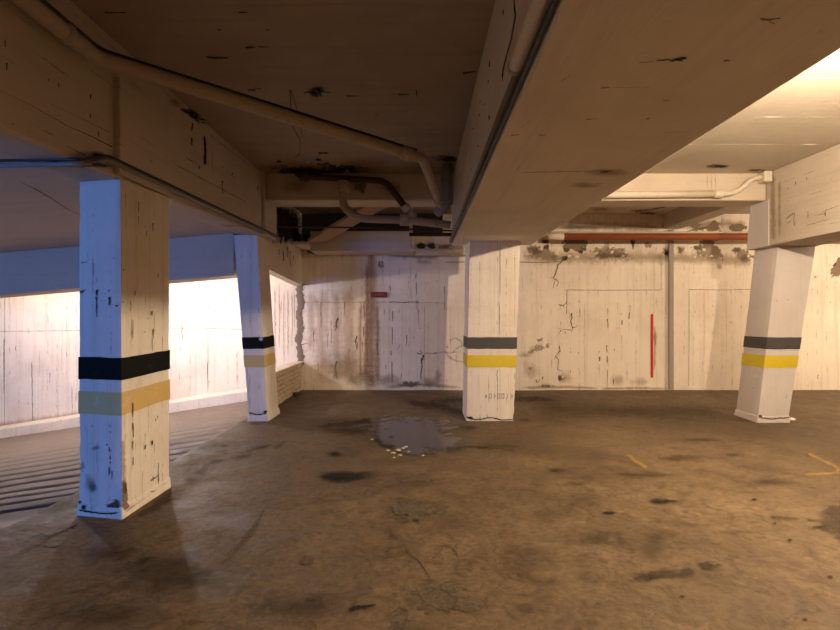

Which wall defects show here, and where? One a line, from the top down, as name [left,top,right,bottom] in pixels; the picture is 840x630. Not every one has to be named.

peeling [526,239,652,261]
peeling [689,220,747,260]
peeling [733,248,754,262]
spalling [295,284,309,366]
crack [536,256,577,383]